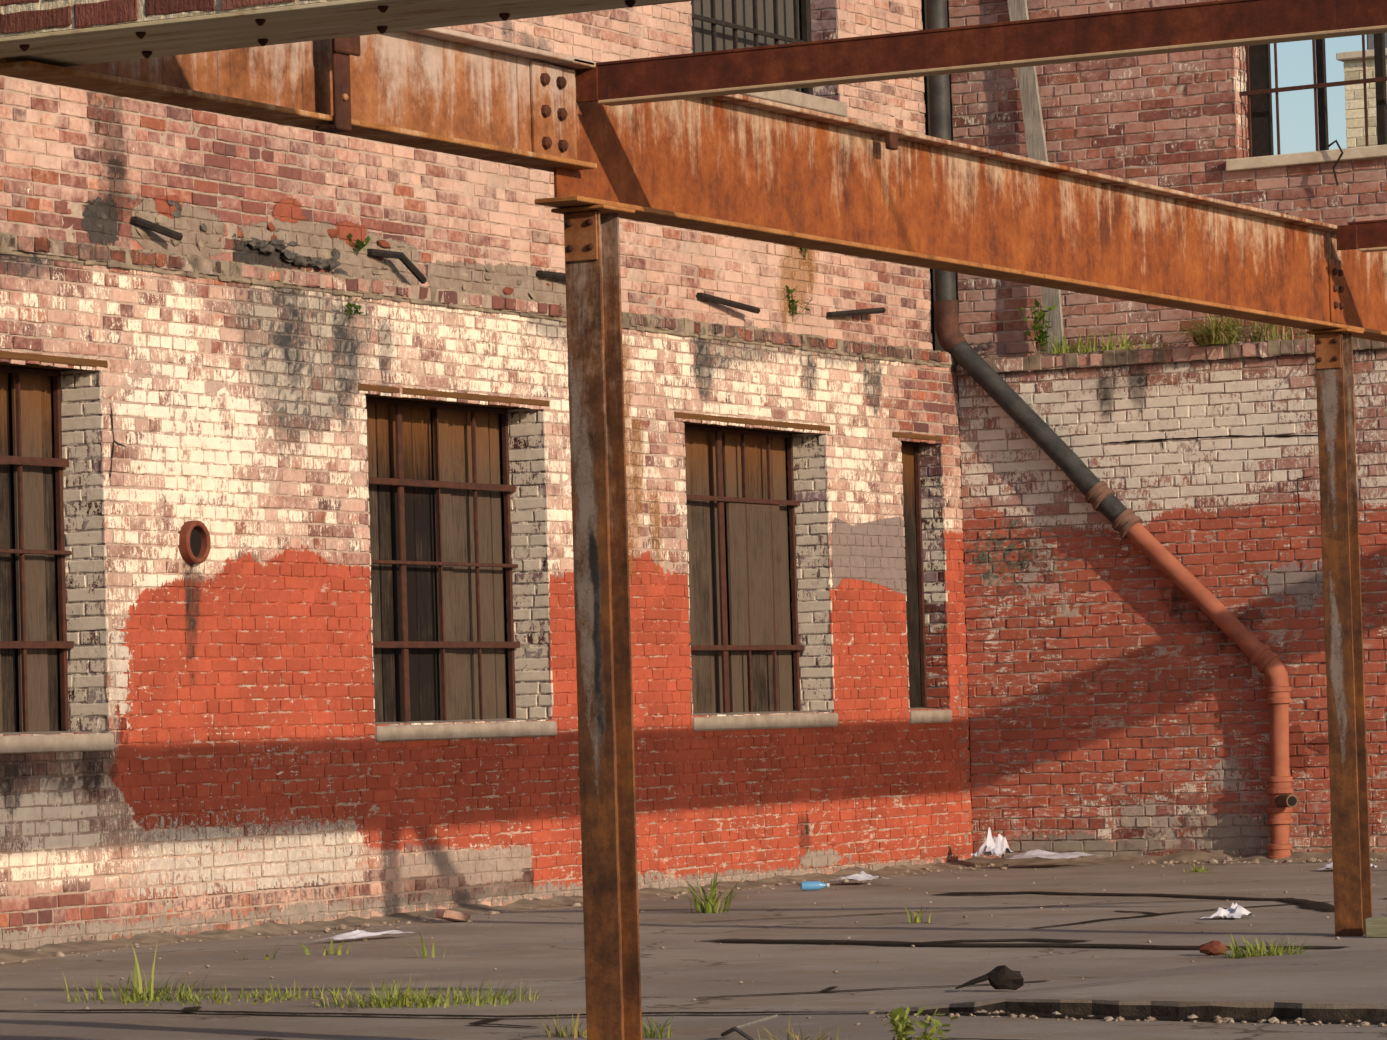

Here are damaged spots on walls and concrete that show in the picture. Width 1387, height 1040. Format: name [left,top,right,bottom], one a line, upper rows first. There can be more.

peeling [1322,368,1338,498]
peeling [107,617,137,738]
peeling [1254,553,1347,773]
peeling [106,794,377,900]
peeling [396,841,534,886]